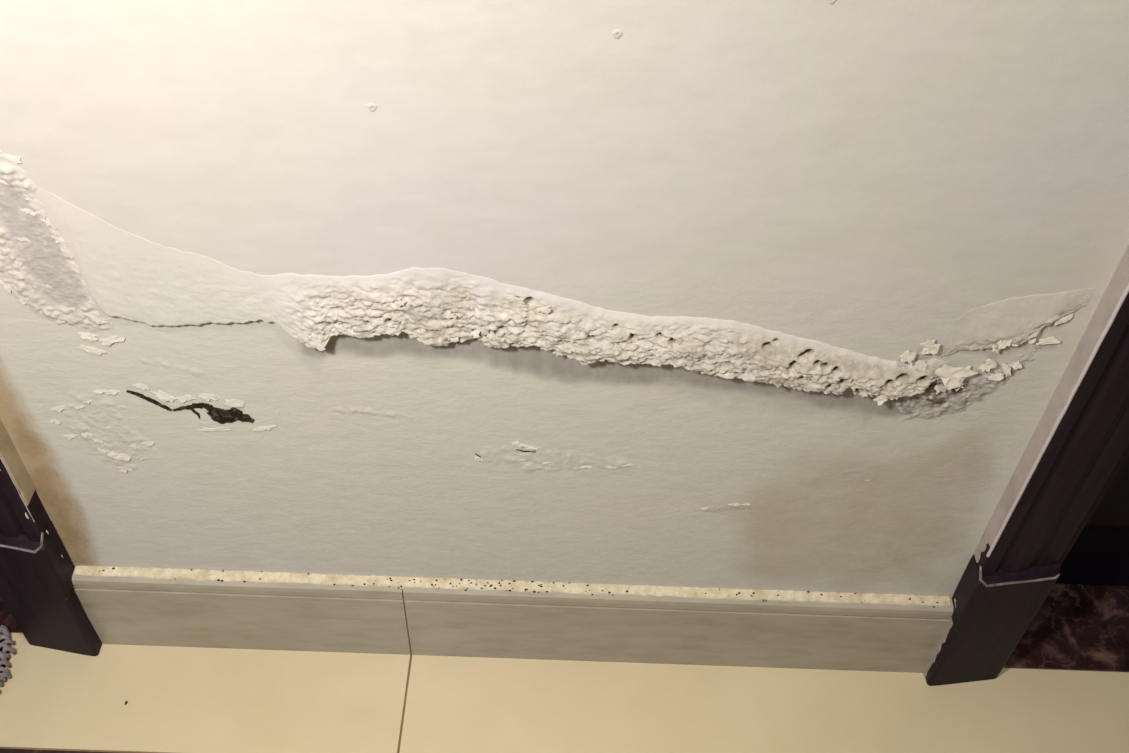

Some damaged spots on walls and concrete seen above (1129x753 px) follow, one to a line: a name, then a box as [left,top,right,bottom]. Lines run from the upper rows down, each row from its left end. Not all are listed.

crack [126,383,277,432]